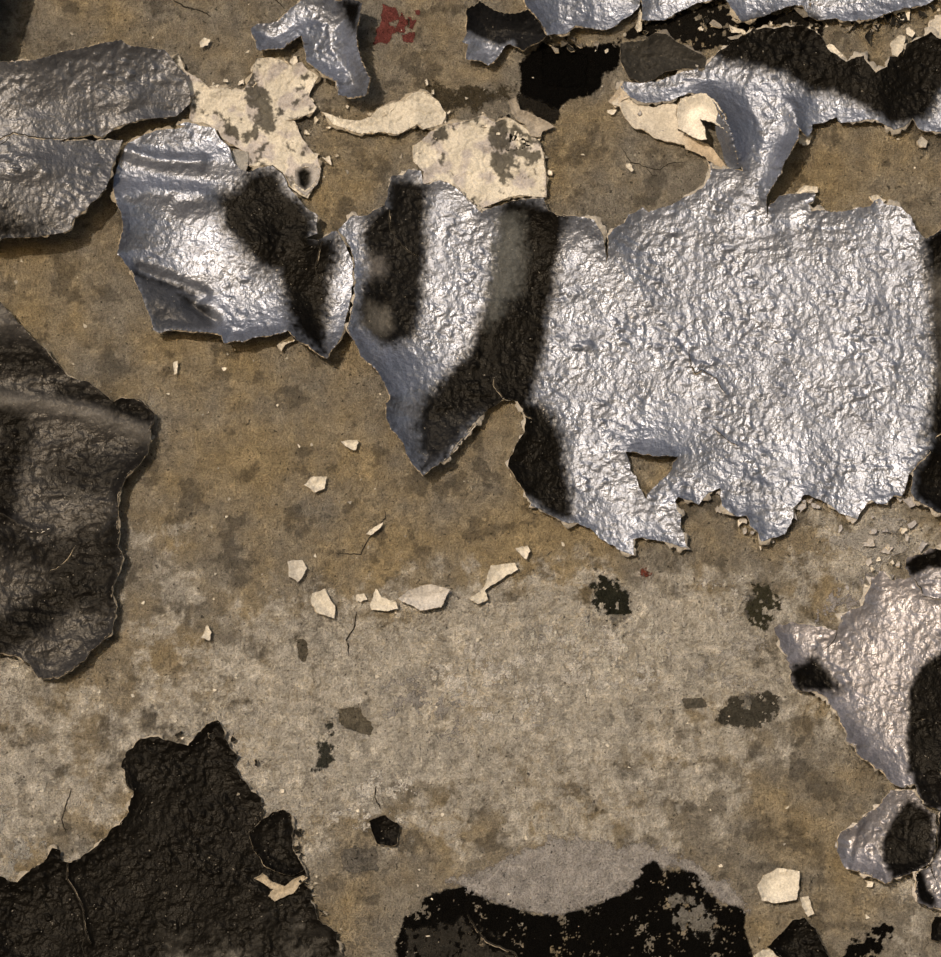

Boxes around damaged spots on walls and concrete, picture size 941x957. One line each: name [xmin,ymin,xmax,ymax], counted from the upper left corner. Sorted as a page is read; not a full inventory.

peeling [0,0,941,557]
peeling [0,302,155,679]
peeling [287,559,307,582]
peeling [310,589,336,619]
peeling [355,584,450,611]
peeling [469,545,531,605]
spalling [297,639,308,662]
spalling [339,707,374,735]
peeling [774,528,941,942]
peeling [0,720,346,957]
spalling [340,815,401,873]
peeling [753,868,829,957]